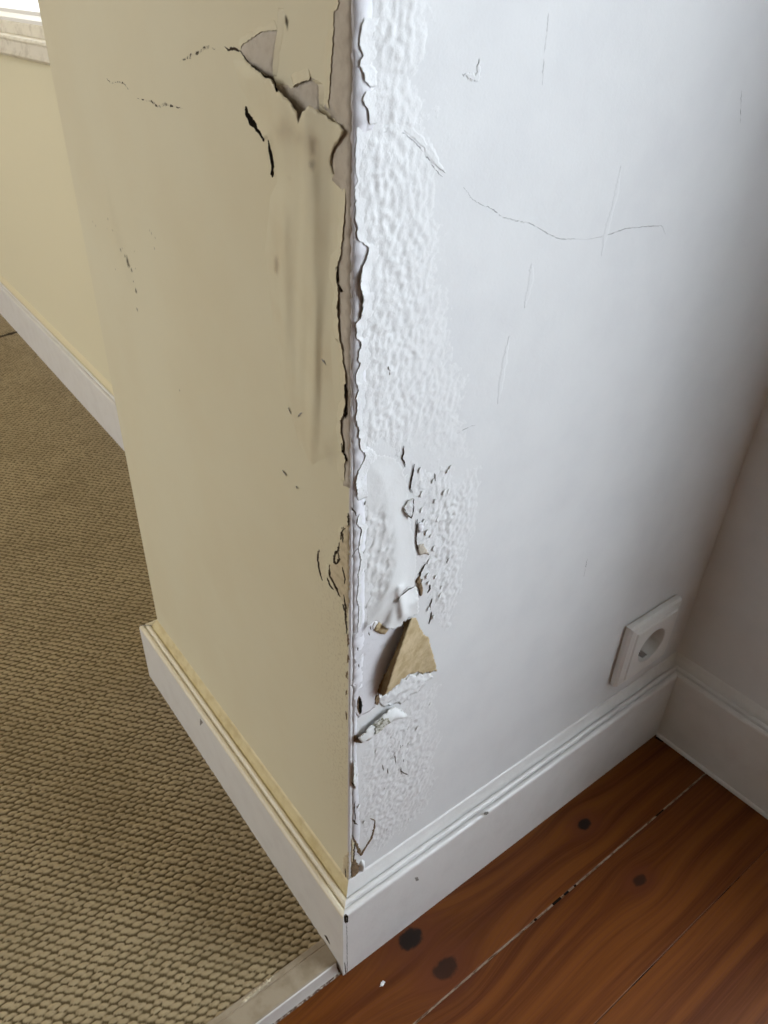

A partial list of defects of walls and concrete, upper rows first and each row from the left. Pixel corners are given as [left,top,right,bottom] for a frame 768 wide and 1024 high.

peeling [224,0,437,879]
crack [382,122,446,175]